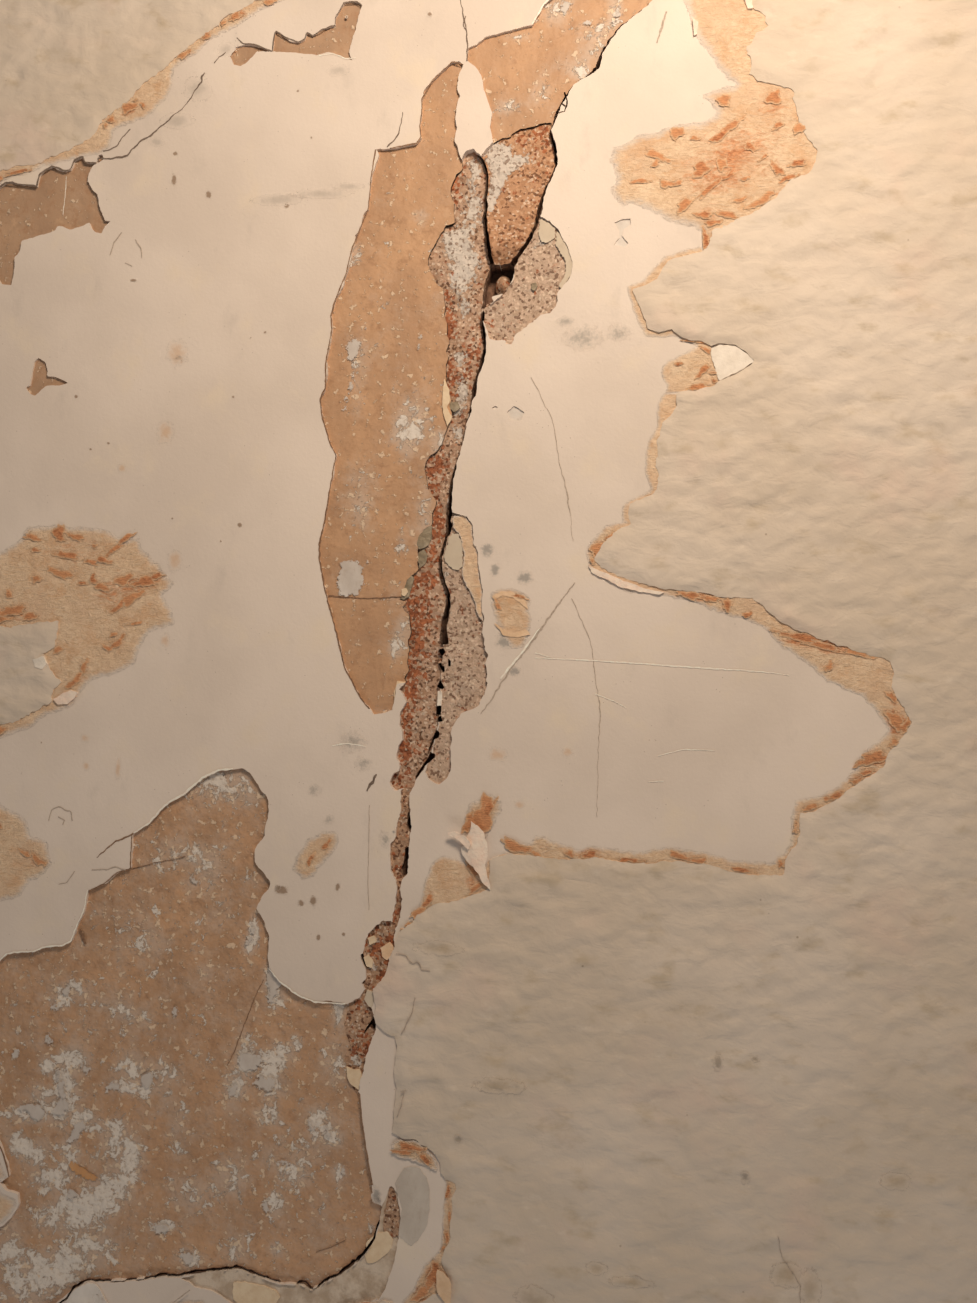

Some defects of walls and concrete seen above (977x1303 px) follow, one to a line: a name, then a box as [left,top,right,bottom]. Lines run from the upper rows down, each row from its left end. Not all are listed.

crack [417,0,649,777]
peeling [0,0,652,1303]
crack [481,582,601,816]
crack [402,813,412,875]
crack [364,953,429,1034]